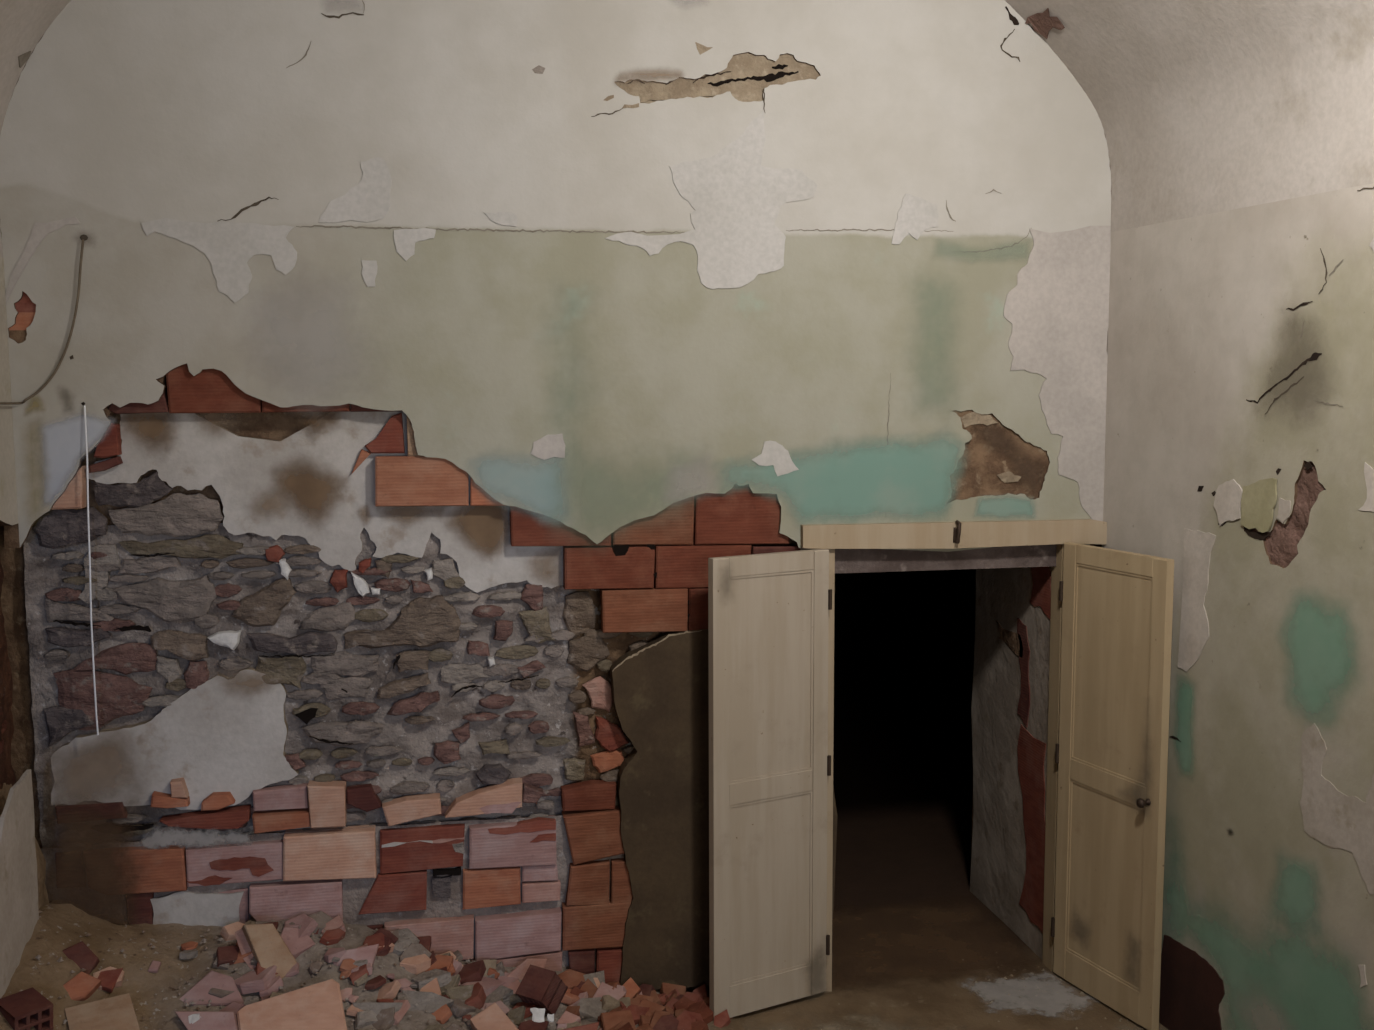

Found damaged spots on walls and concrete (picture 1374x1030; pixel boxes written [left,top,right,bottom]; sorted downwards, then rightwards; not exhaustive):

flaking render [695,42,713,55]
flaking render [1025,8,1065,39]
flaking render [9,292,36,343]
peeling [604,53,820,289]
peeling [891,194,939,245]
peeling [947,226,1111,521]
flaking render [1178,461,1326,672]
flaking render [0,558,49,998]
flaking render [32,364,801,1030]